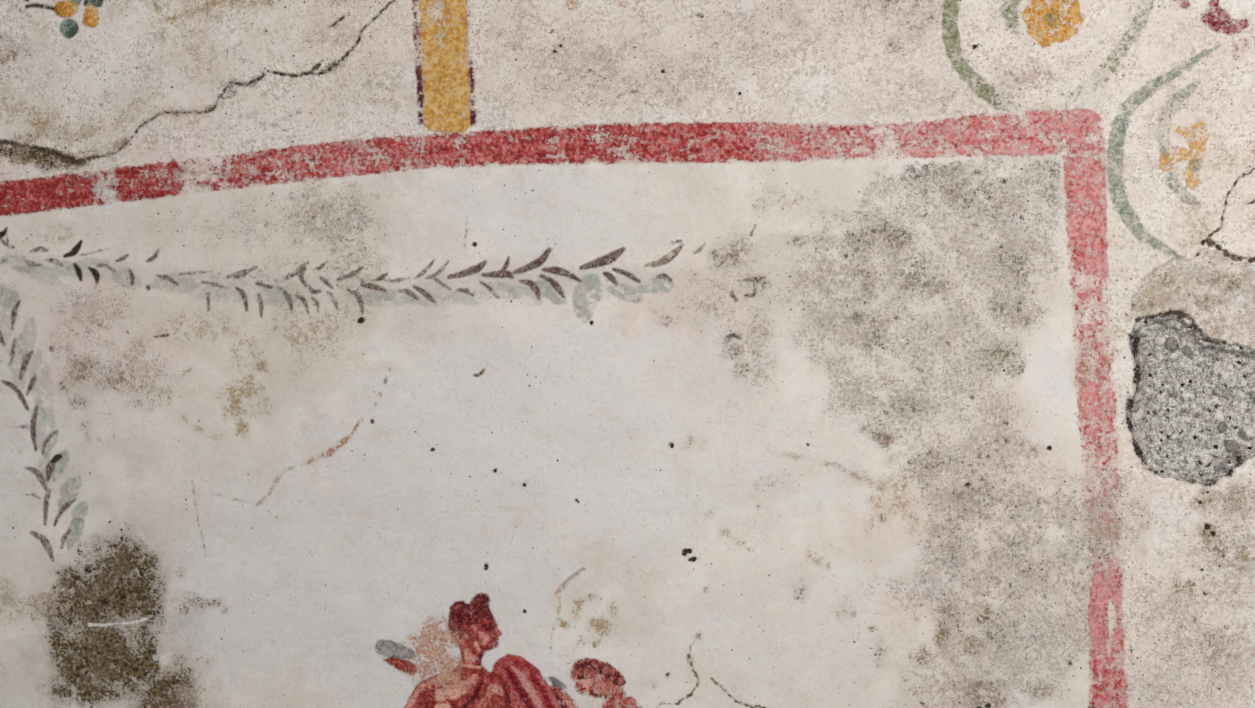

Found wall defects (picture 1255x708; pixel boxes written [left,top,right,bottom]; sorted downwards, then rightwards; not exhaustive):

crack [0,0,395,166]
peeling [1131,201,1255,349]
crack [1201,169,1255,263]
leakage [825,462,907,521]
leakage [45,521,228,708]
crack [660,633,766,708]